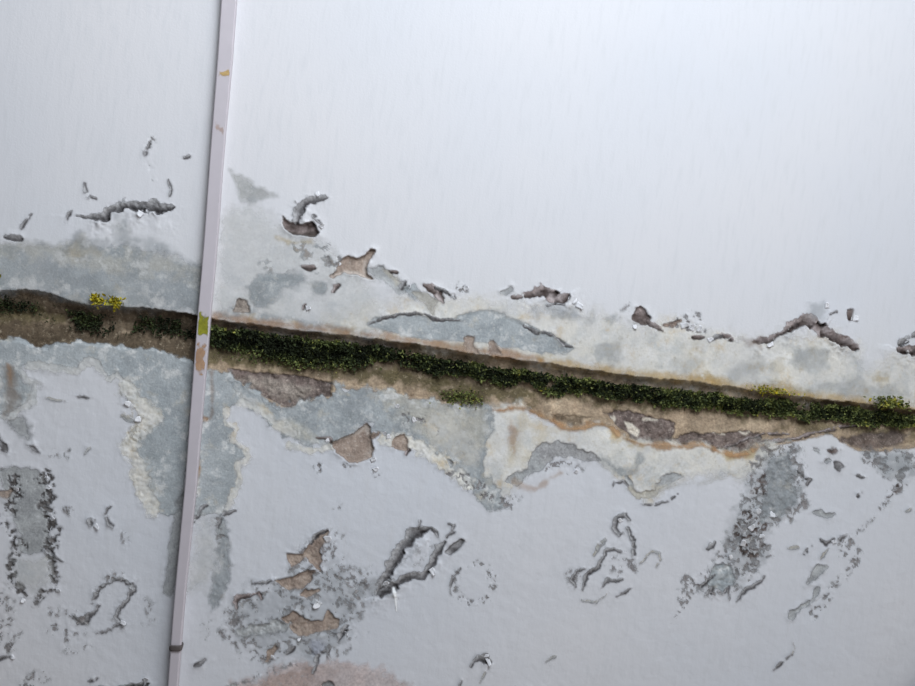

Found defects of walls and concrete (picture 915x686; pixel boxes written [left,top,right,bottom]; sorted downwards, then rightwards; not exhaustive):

water stain [0,240,202,313]
flaking render [283,191,328,237]
water stain [395,297,915,403]
peeling [0,466,72,661]
peeling [47,573,137,653]
water stain [0,336,194,596]
peeling [219,520,464,674]
flaking render [316,423,411,475]
water stain [194,369,775,608]
peeling [565,513,662,603]
peeling [608,410,835,617]
spalling [788,430,915,620]